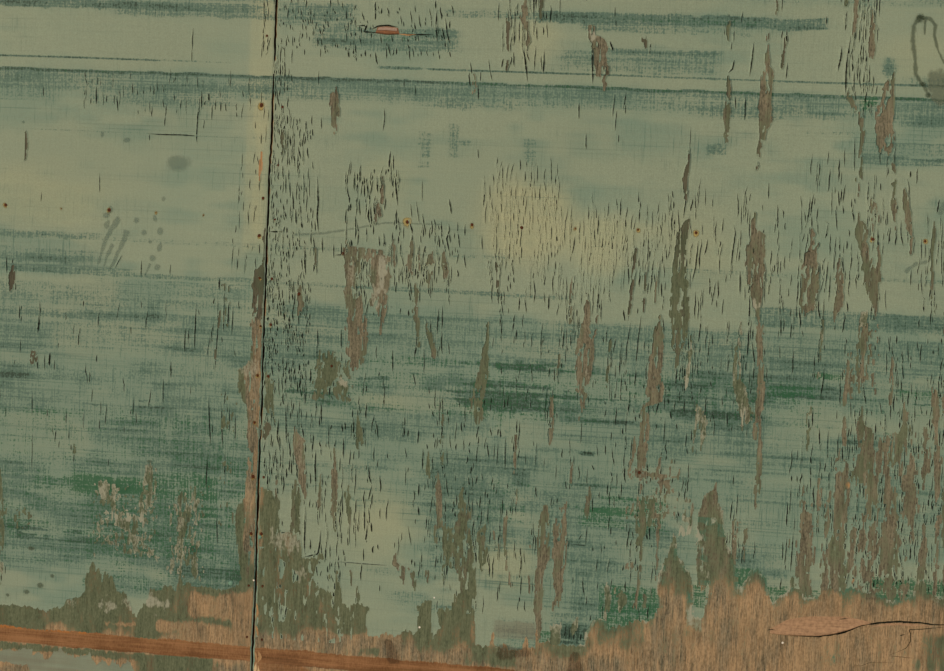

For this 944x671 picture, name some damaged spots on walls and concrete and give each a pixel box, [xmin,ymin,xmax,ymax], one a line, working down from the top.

peeling [722,75,733,147]
peeling [754,29,789,171]
peeling [840,0,897,198]
peeling [424,306,444,360]
peeling [547,273,603,422]
peeling [603,338,637,416]
peeling [622,149,716,455]
peeling [708,278,720,308]
peeling [719,186,793,511]
peeling [799,405,814,478]
peeling [391,532,436,592]
peeling [514,548,526,612]